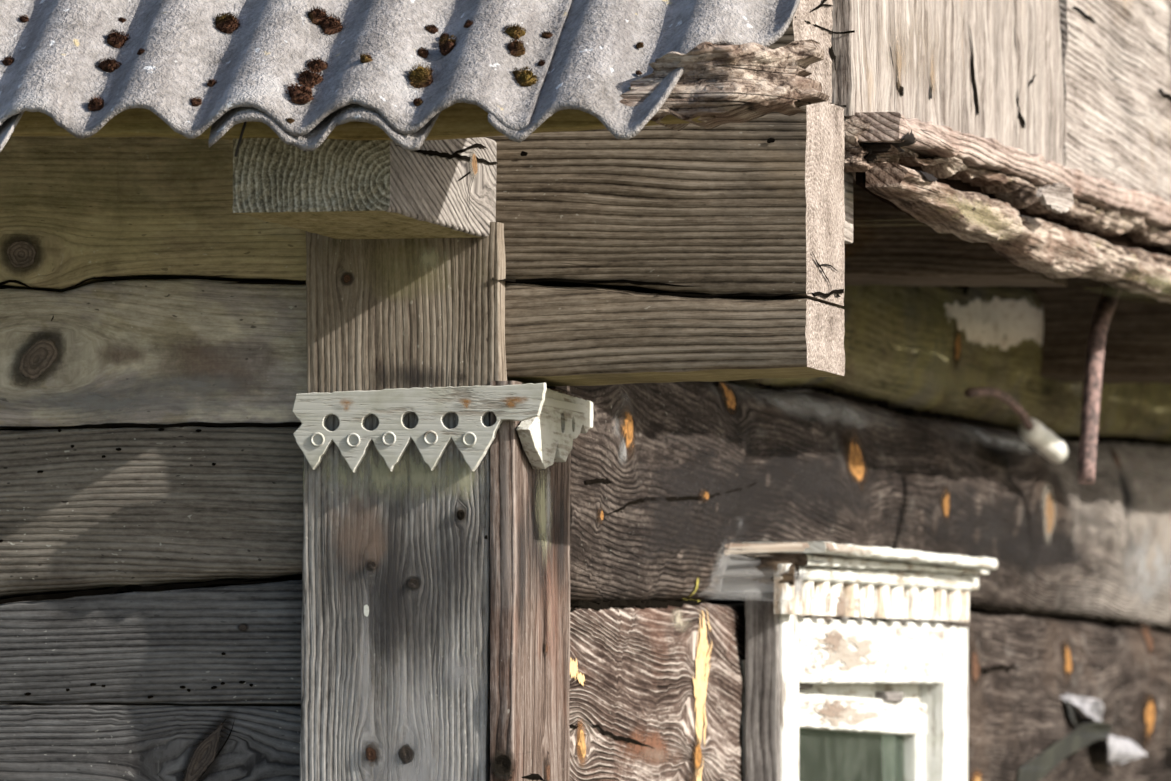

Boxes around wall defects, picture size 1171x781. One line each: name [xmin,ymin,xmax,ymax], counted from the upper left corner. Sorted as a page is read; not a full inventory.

crack [493,249,844,299]
crack [0,275,302,321]
crack [585,478,758,515]
leakage [328,519,468,708]
peeling [799,586,879,674]
crack [570,718,655,749]
peeling [812,699,879,727]